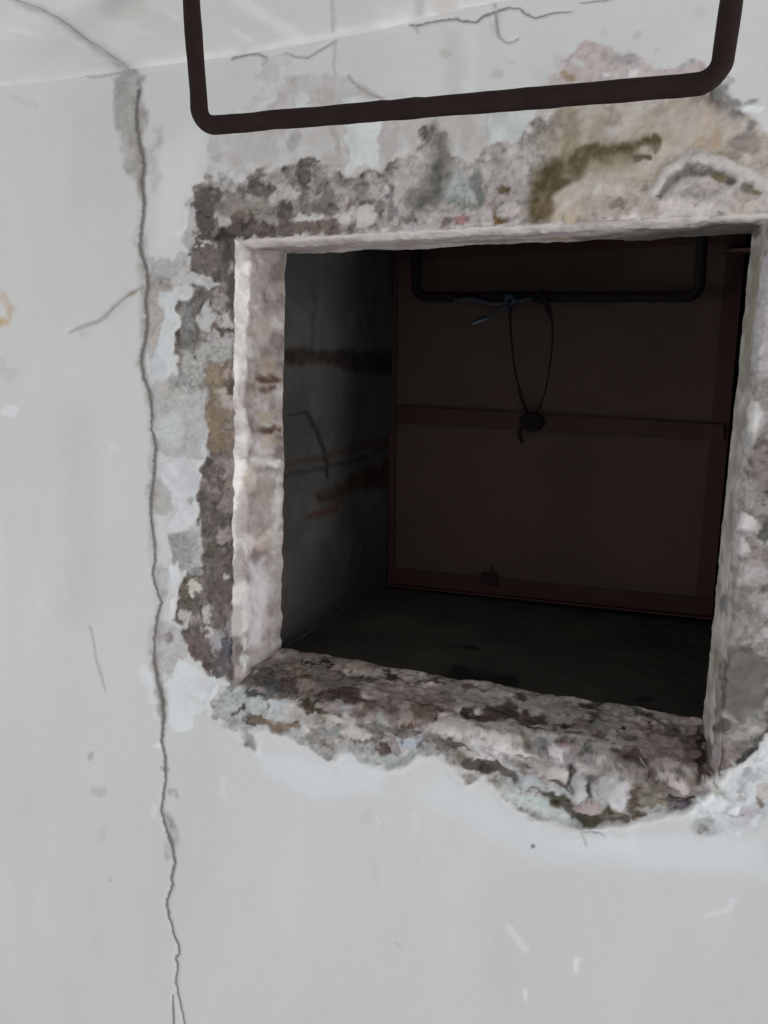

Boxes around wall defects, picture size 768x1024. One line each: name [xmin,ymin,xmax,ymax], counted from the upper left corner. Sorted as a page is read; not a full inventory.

damp [216,52,395,115]
crack [231,0,385,100]
damp [203,73,766,226]
crack [408,0,610,43]
peeling [544,39,709,86]
peeling [598,97,691,108]
crack [3,0,185,1024]
spalling [149,110,768,839]